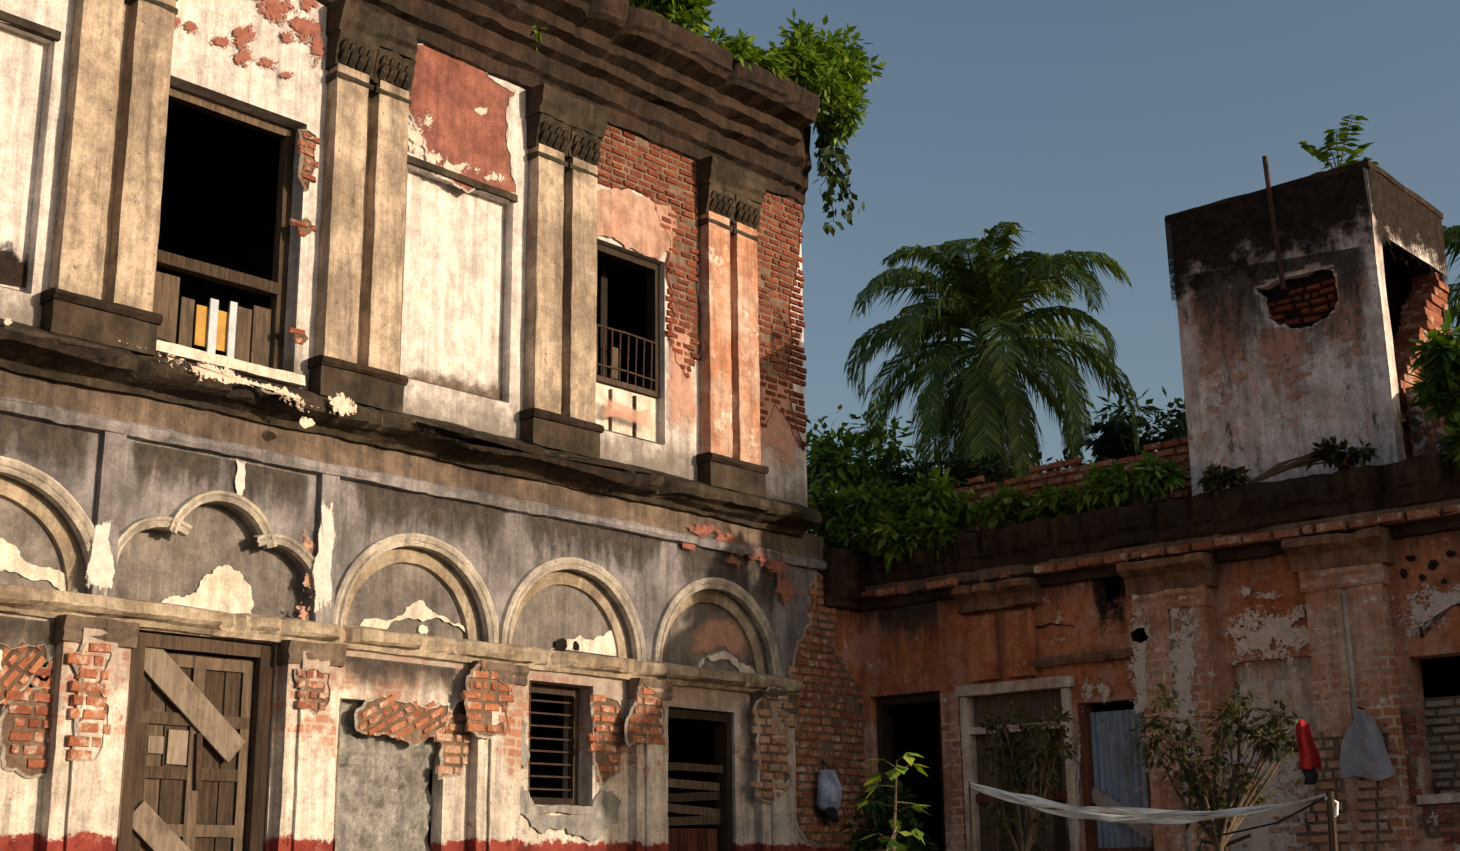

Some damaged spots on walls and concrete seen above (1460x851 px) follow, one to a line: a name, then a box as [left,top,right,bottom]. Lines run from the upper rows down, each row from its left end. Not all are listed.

peeling [174,0,328,80]
peeling [408,43,517,194]
water stain [0,241,28,288]
flaking render [597,124,702,379]
flaking render [757,190,807,451]
water stain [1164,167,1448,341]
peeling [0,538,66,591]
flaking render [0,641,113,779]
flaking render [354,659,665,842]
flaking render [681,520,867,850]
peeling [1101,586,1311,849]
flaking render [1221,694,1460,851]